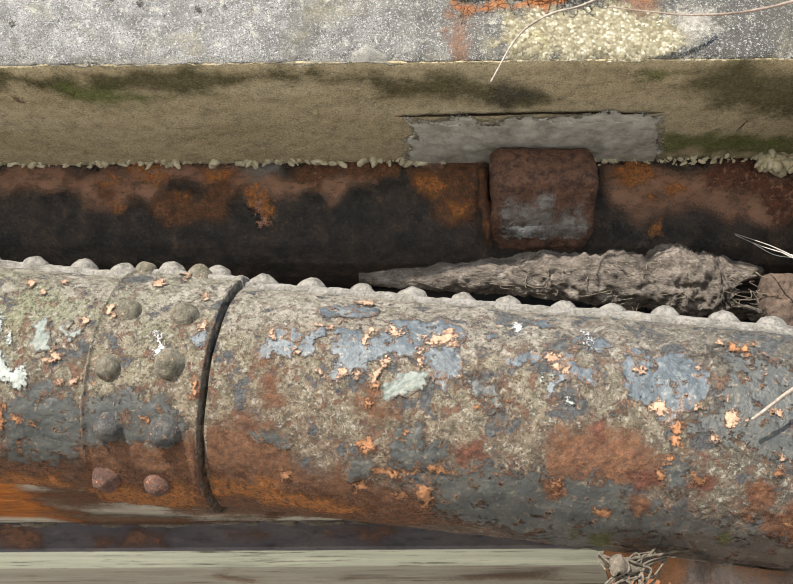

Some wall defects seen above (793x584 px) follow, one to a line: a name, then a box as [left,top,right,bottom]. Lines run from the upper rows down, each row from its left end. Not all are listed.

rust [446,0,567,61]
damp [362,72,552,108]
rust [0,161,485,229]
rust [605,159,793,236]
peeling [28,308,91,364]
peeling [147,330,168,361]
peeling [189,318,211,354]
peeling [253,299,514,417]
peeling [0,370,190,469]
rust [0,413,468,549]
peeling [341,329,793,570]
rust [546,419,662,489]